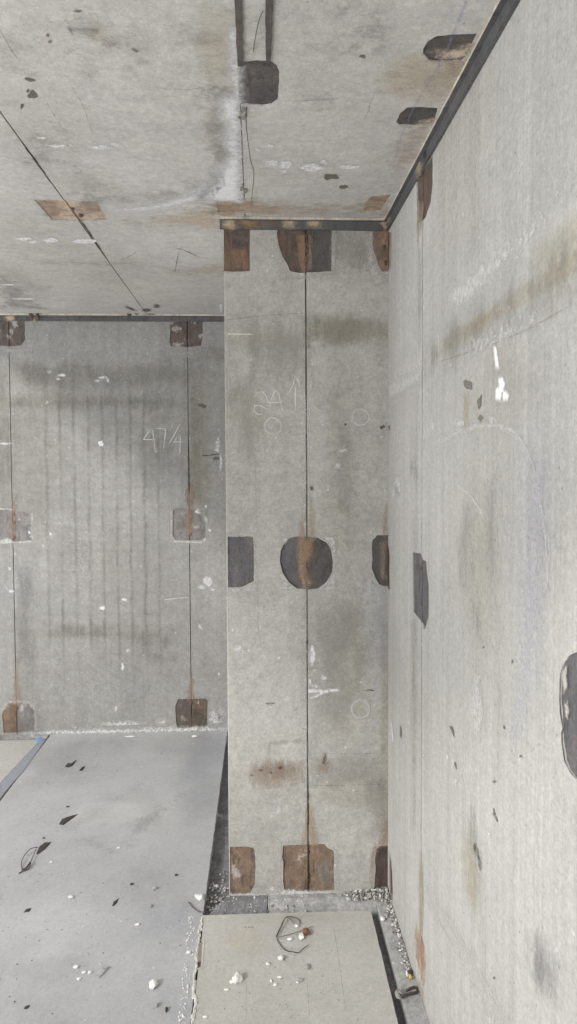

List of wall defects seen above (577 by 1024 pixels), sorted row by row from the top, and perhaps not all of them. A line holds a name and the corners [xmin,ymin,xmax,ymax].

rust [298,537,312,585]